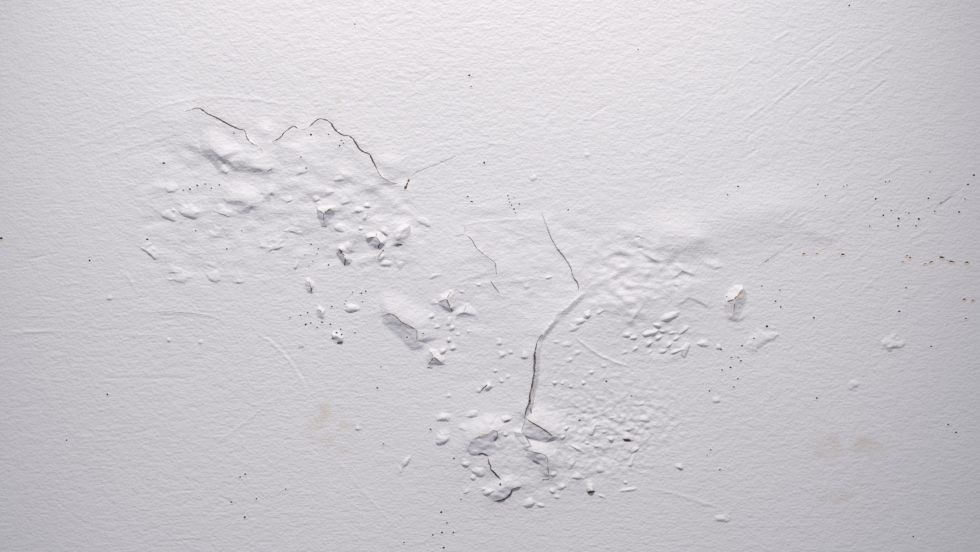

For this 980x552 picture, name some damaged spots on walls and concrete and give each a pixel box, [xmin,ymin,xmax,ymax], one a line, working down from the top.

crack [186,107,459,189]
crack [458,233,500,293]
crack [542,215,579,291]
peeling [721,283,749,322]
spalling [380,313,447,370]
crack [520,333,543,421]
spalling [466,428,504,457]
crack [484,456,504,486]
peeling [493,485,519,502]
spalling [513,417,555,481]